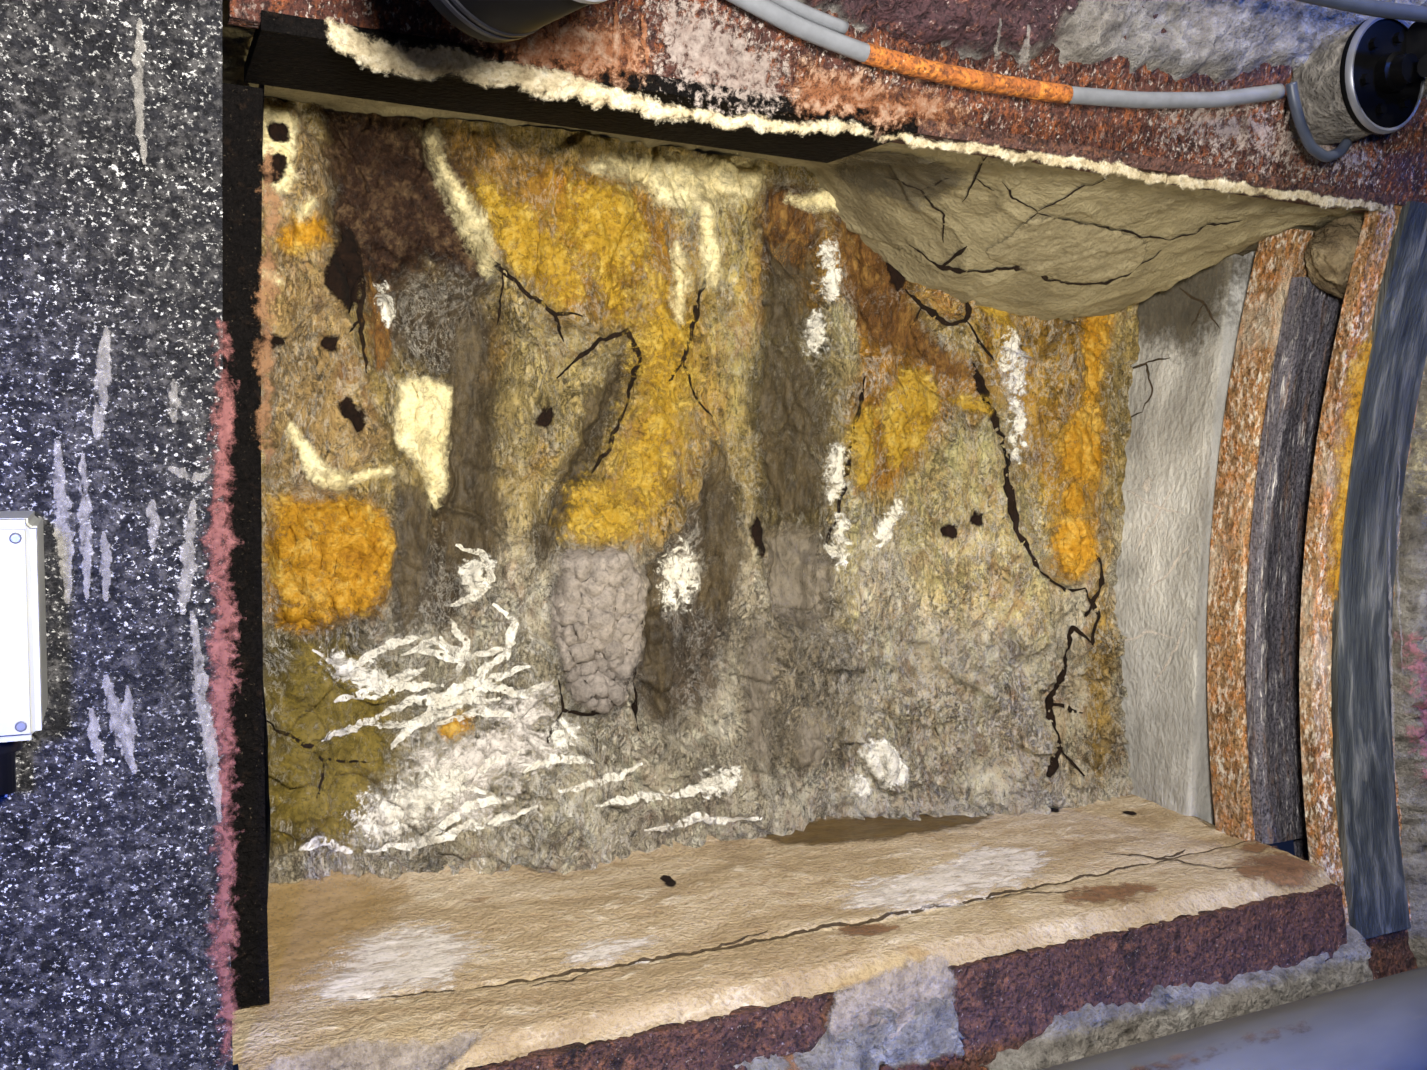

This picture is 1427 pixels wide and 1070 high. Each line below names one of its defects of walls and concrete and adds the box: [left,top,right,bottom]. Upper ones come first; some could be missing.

rust [465,1,650,85]
rust [788,58,970,132]
crack [349,228,368,373]
crack [468,242,713,473]
crack [888,157,1244,778]
rust [1327,340,1372,599]
leakage [263,326,990,854]
leakage [267,871,491,1004]
leakage [566,935,652,965]
crack [347,839,1270,1000]
rust [1233,841,1322,887]